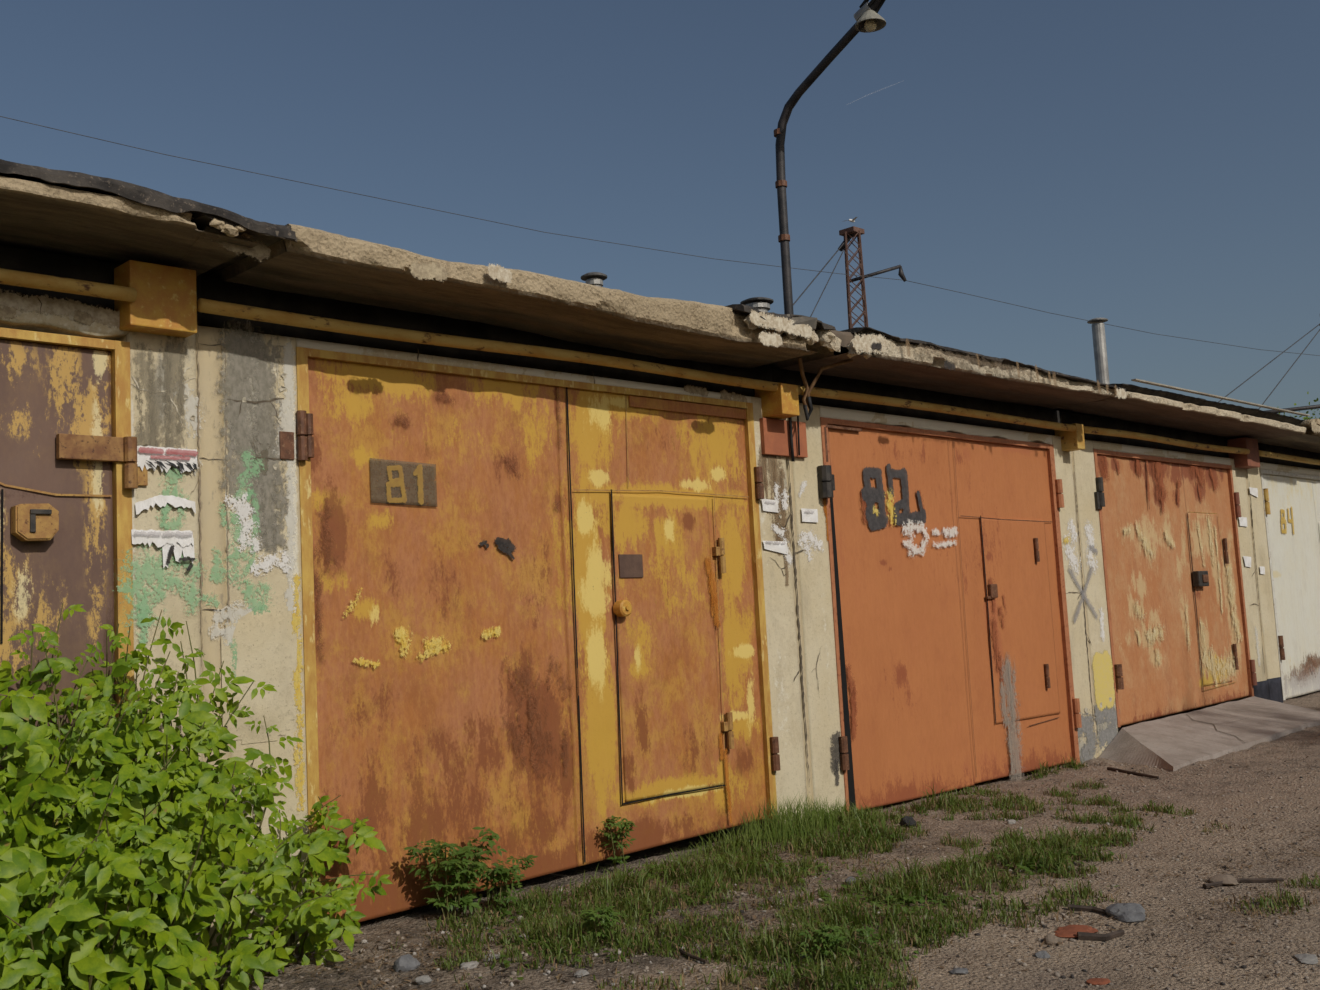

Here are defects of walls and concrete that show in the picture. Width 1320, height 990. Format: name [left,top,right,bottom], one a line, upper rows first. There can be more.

spalling [203,218,271,262]
spalling [744,309,887,359]
peeling [174,319,306,811]
corrosion [845,663,858,741]